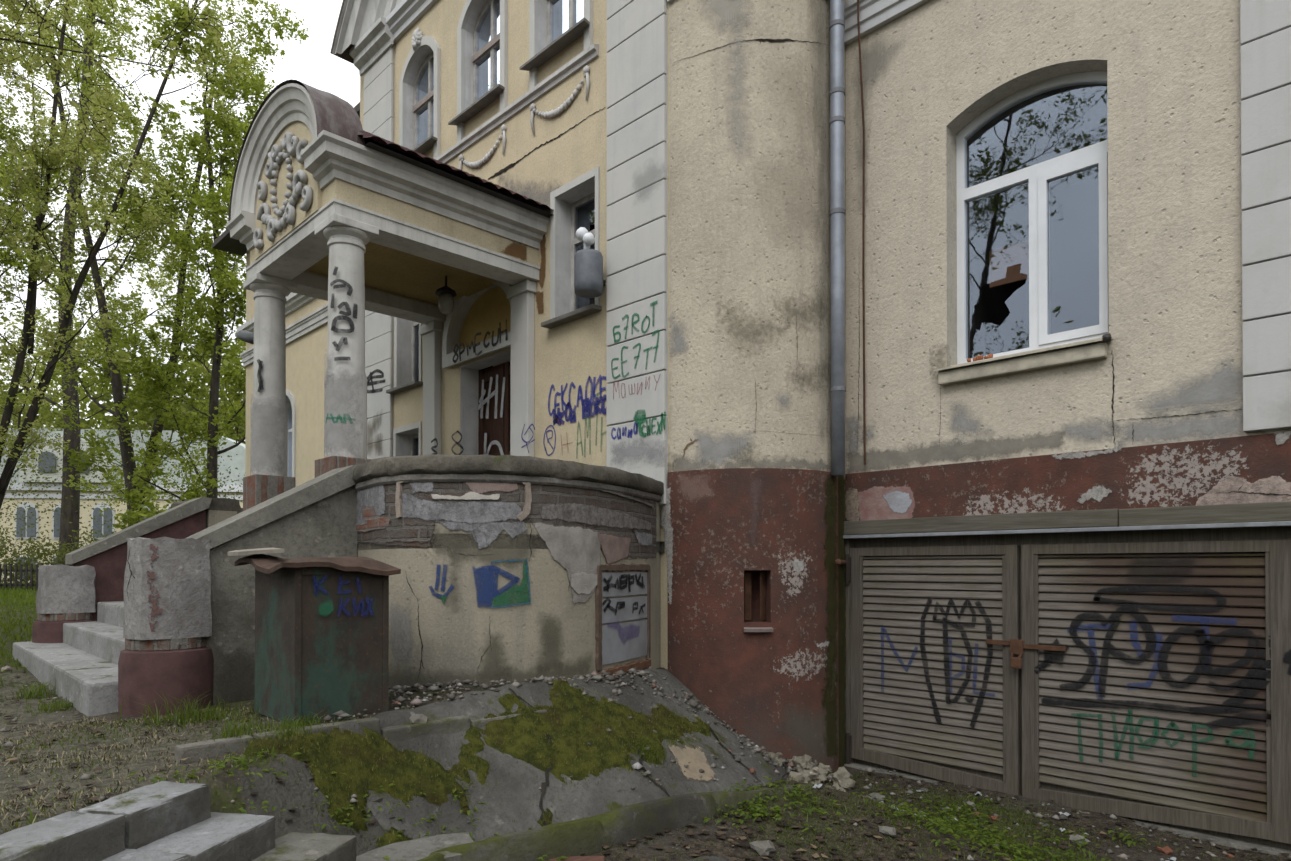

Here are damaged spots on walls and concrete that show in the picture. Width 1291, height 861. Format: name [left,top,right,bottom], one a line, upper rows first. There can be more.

crack [672,38,827,64]
flaking render [356,474,714,605]
peeling [845,485,916,521]
water stain [613,365,1242,767]
peeling [963,441,1291,516]
crack [610,715,670,796]
crack [705,720,759,780]